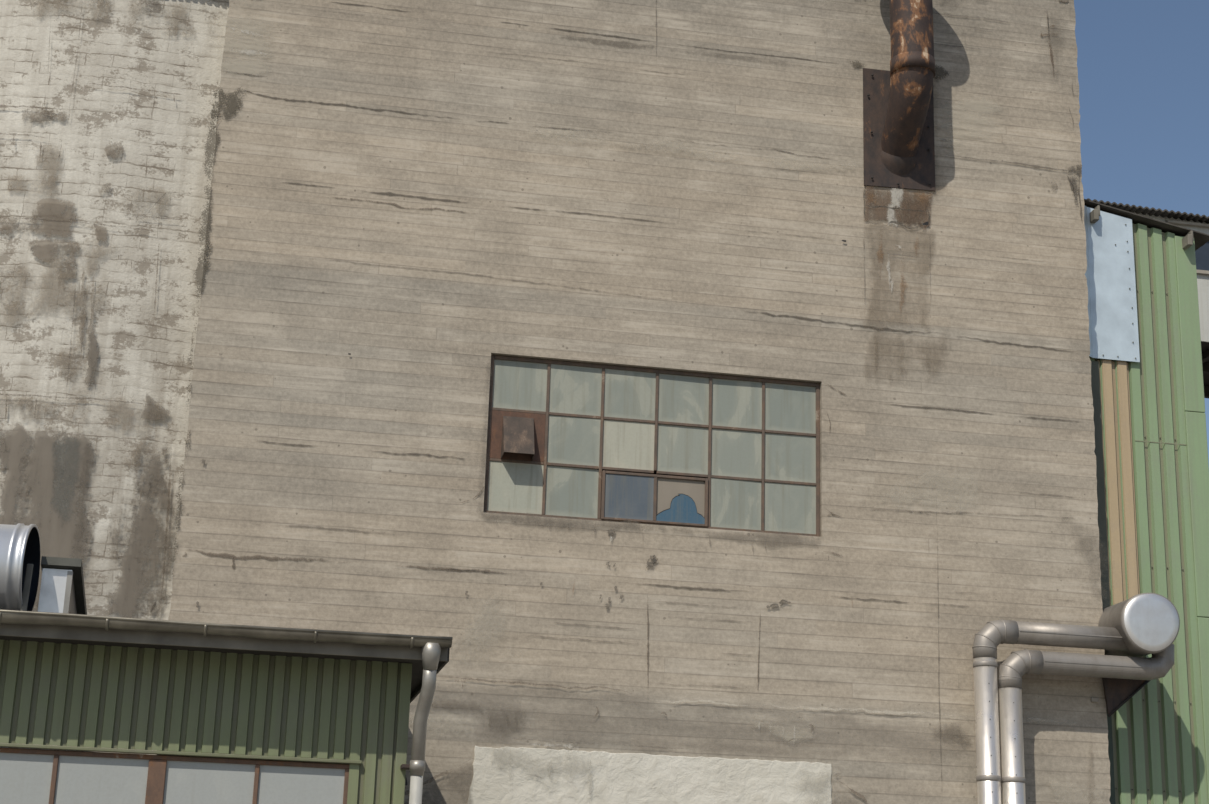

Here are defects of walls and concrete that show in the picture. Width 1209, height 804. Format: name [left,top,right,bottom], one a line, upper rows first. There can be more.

crack [503,22,646,41]
crack [288,182,464,213]
crack [514,207,663,223]
crack [151,467,344,611]
crack [408,565,495,573]